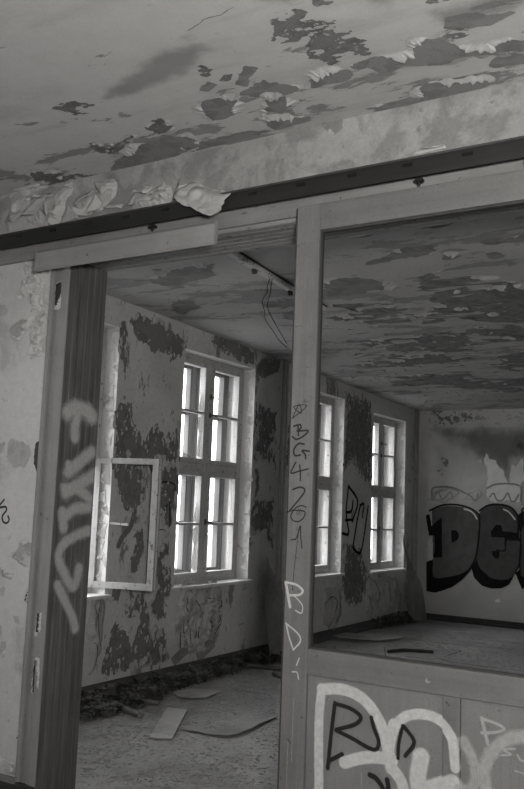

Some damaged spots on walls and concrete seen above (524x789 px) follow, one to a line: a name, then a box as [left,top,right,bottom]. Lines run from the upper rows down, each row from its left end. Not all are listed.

peeling [24,170,97,185]
peeling [52,101,95,116]
peeling [89,0,524,171]
peeling [249,285,294,326]
peeling [323,224,524,426]
peeling [86,262,219,680]
peeling [211,335,289,571]
peeling [332,393,373,609]
peeling [396,422,405,563]
water stain [462,432,524,468]